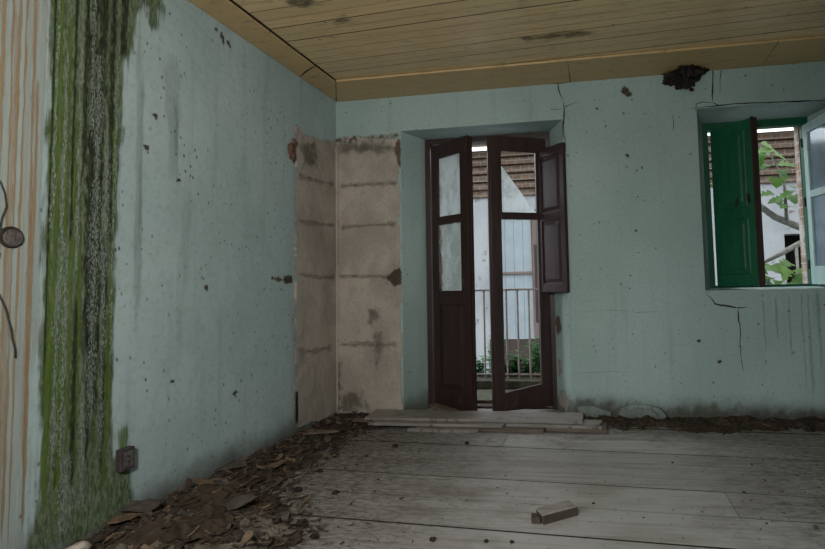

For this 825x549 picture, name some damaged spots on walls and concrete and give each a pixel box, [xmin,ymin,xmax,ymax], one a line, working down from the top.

crack [550,80,578,148]
damp [0,0,128,549]
crack [706,294,746,367]